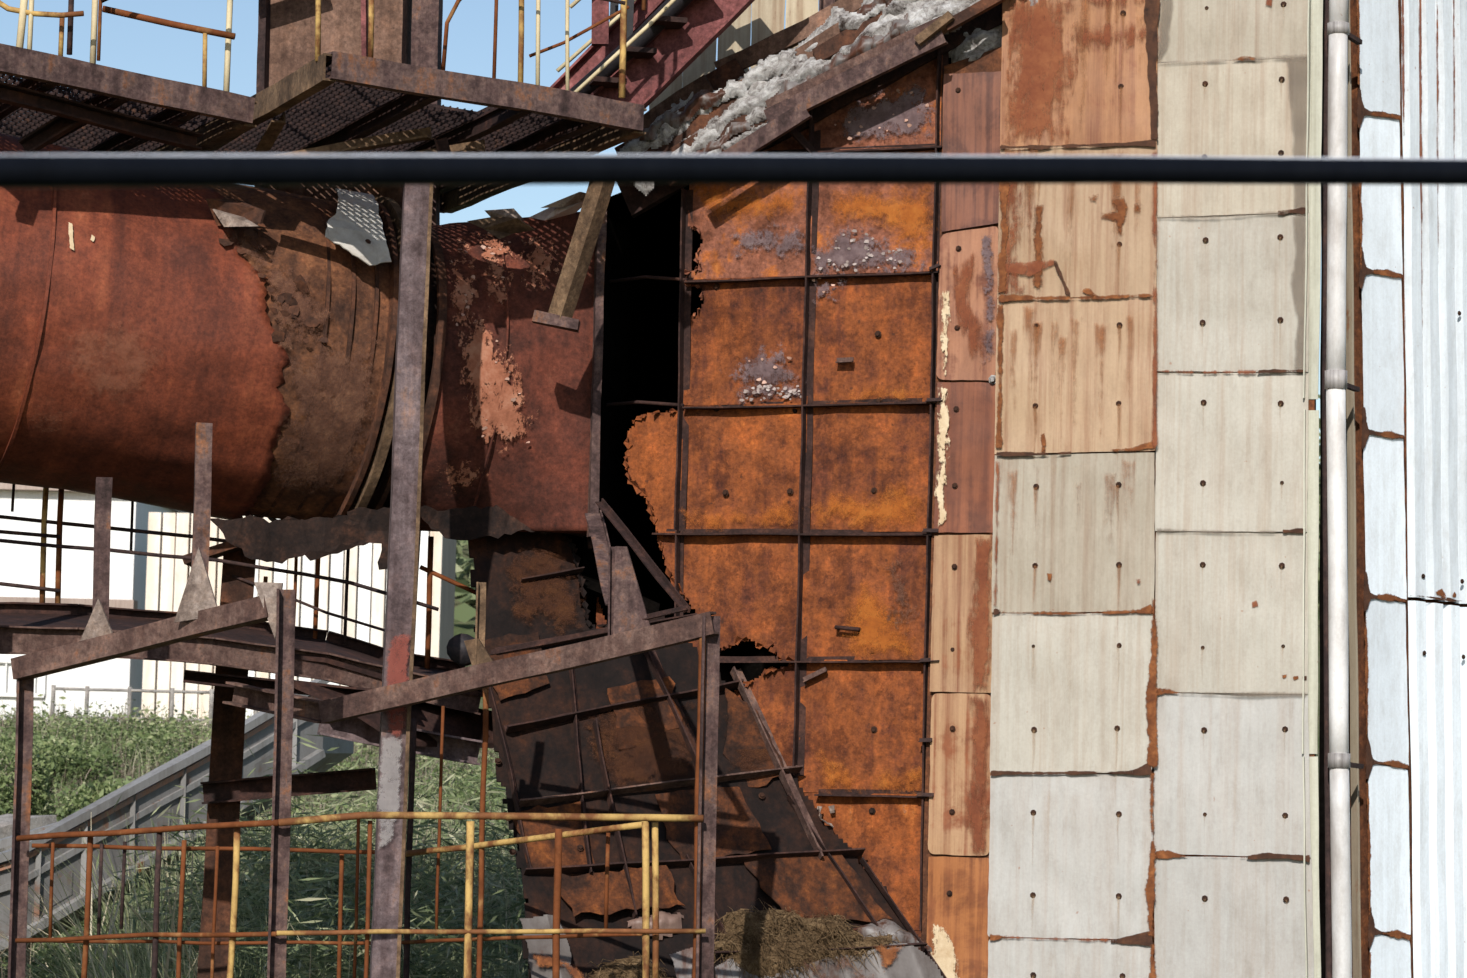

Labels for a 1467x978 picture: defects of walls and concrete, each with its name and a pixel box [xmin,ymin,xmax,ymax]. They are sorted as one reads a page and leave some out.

corrosion [1000,0,1160,156]
corrosion [1357,0,1455,158]
corrosion [706,193,793,218]
peeling [450,231,559,453]
corrosion [1358,185,1439,457]
peeling [438,460,489,492]
peeling [623,408,689,601]
corrosion [816,184,1310,978]
peeling [723,635,795,687]
peeling [817,805,835,827]
corrosion [1364,572,1461,978]